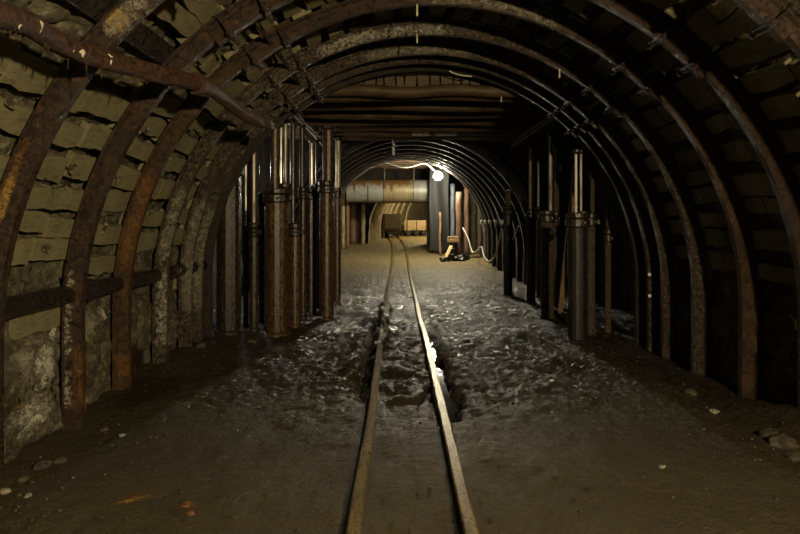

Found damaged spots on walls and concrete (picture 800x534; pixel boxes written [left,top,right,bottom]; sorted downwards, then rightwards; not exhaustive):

rust [0,140,29,219]